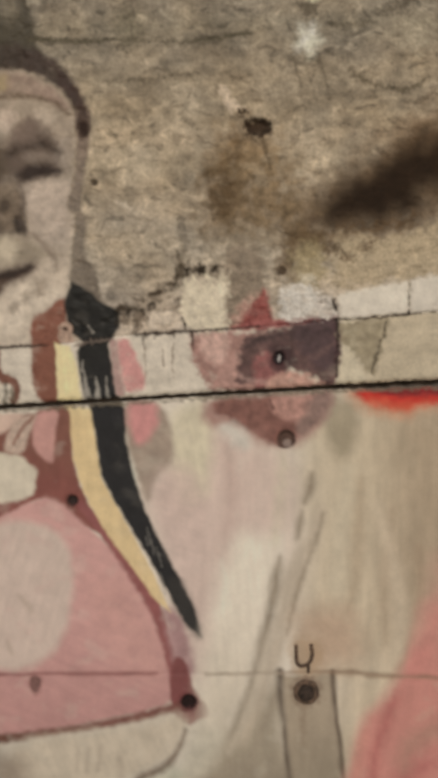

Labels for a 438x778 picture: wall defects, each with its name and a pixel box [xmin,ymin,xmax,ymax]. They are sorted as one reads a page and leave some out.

water stain [113,110,438,336]
crack [0,342,49,351]
crack [137,315,261,381]